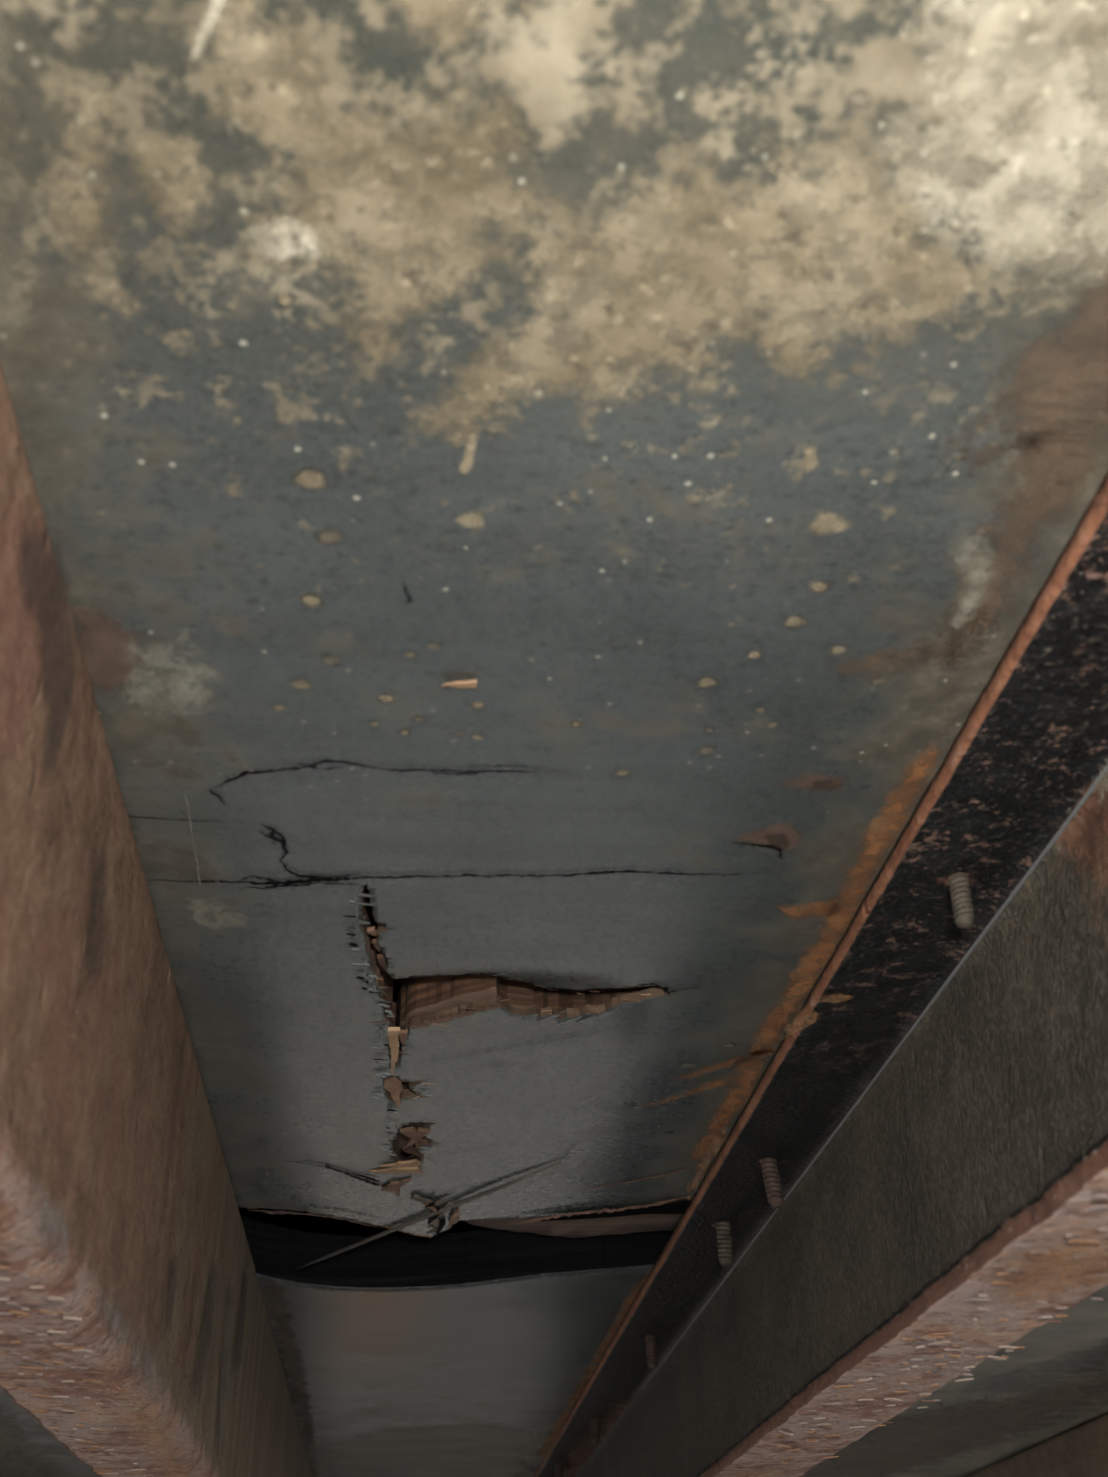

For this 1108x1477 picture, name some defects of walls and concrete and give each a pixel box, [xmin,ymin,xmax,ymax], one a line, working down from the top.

damp [192,0,224,57]
damp [805,448,817,472]
damp [829,276,1108,685]
crack [130,759,782,889]
corrosion [641,750,938,1201]
crack [250,1210,380,1228]
crack [284,1160,490,1198]
crack [515,1167,696,1224]